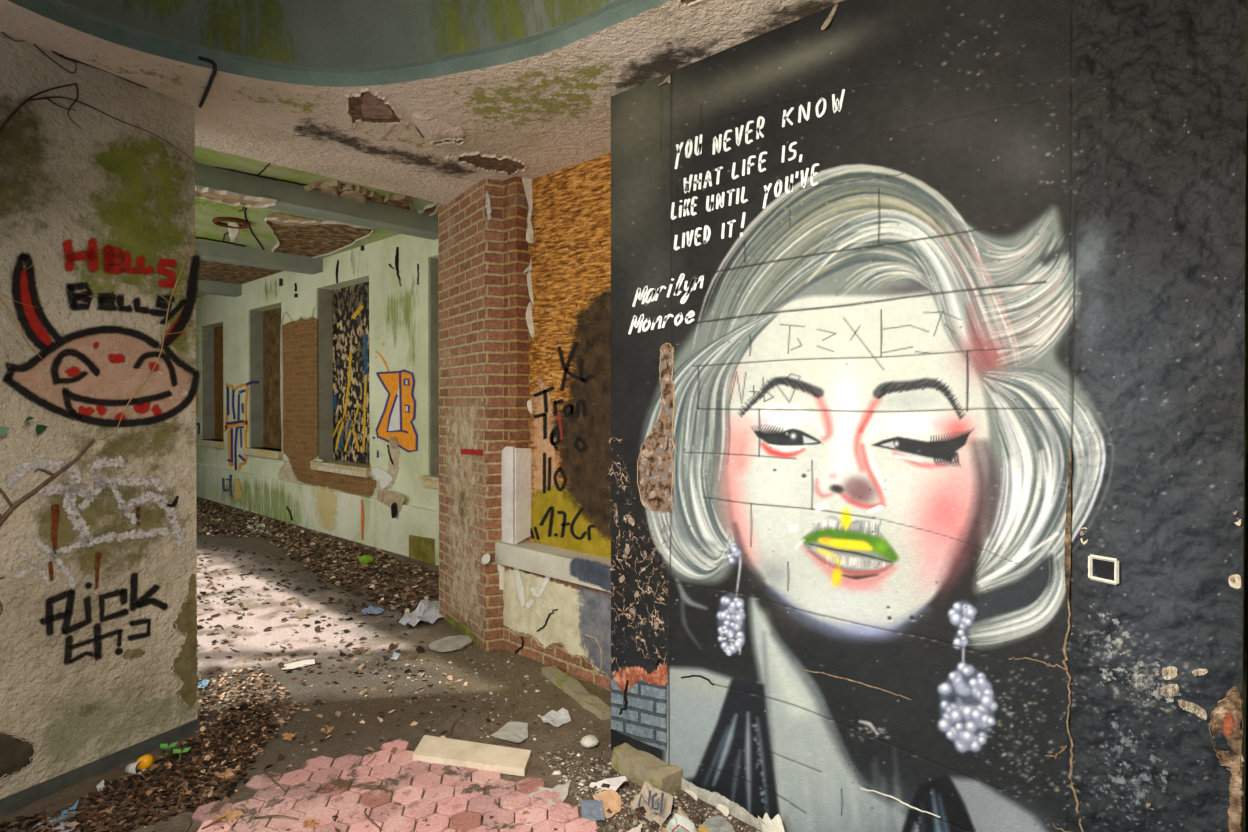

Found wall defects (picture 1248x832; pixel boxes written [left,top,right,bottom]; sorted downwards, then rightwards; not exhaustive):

damp [437,0,526,54]
spalling [345,87,409,138]
spalling [195,187,374,259]
spalling [430,137,535,243]
peeling [523,261,535,338]
flaking render [609,342,675,751]
spalling [170,574,199,709]
spalling [1160,447,1248,832]
spalling [0,730,36,779]
crack [1009,597,1083,832]